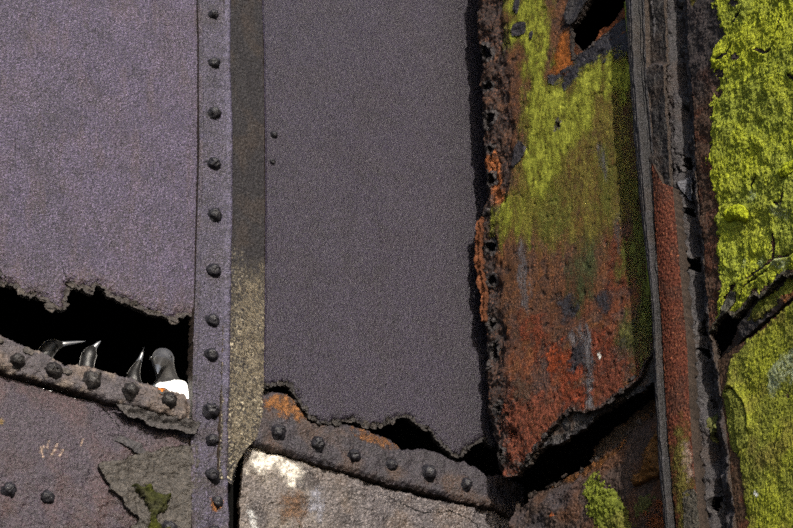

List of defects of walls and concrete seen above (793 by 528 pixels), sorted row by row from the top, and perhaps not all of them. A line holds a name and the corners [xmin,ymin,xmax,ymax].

peeling [563,0,588,25]
rust [484,151,505,204]
peeling [0,268,25,295]
peeling [39,296,70,313]
rust [474,217,489,323]
rust [502,314,640,482]
rust [630,426,660,487]